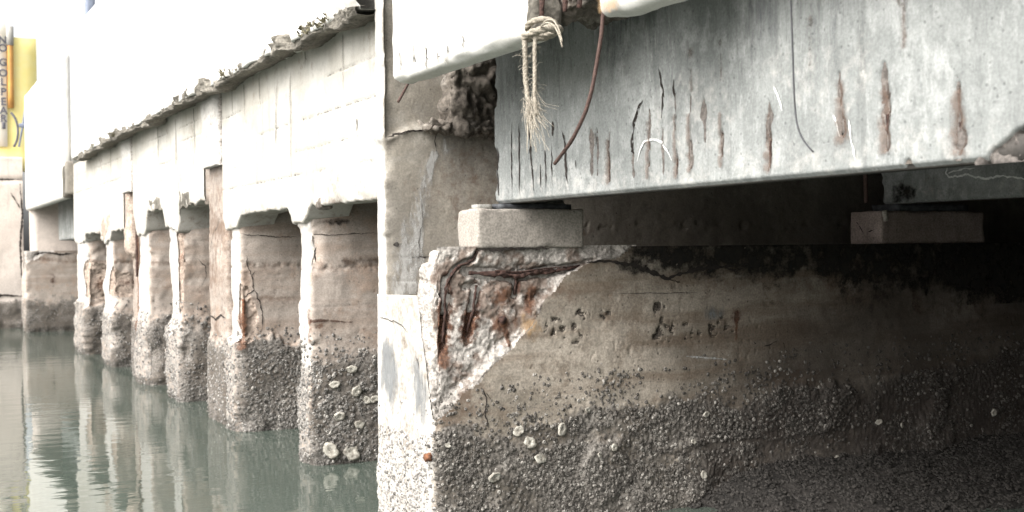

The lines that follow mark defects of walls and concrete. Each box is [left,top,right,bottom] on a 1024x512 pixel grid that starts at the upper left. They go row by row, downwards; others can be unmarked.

rust [236,314,246,350]
crack [242,233,364,331]
rust [437,271,480,369]
rust [492,281,540,347]
spalling [416,245,636,421]
water stain [620,242,1024,317]